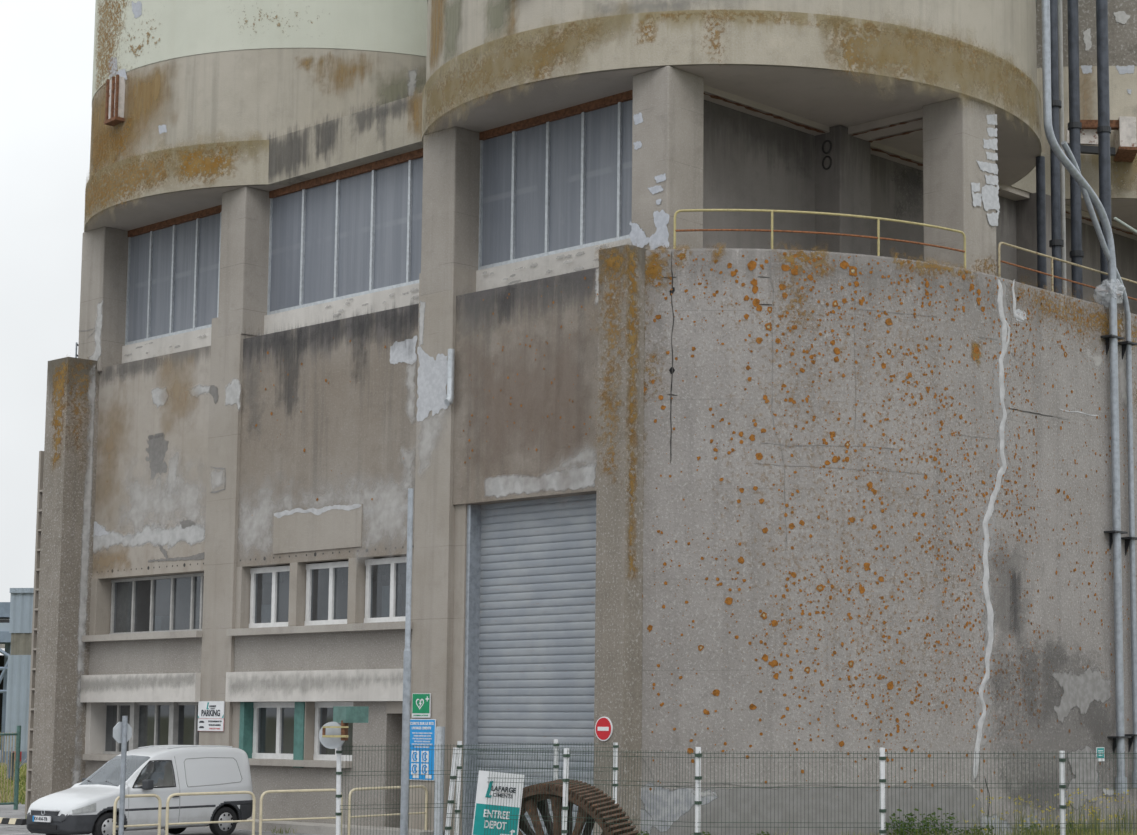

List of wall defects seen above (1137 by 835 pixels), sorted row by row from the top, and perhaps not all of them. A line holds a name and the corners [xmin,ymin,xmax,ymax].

corrosion [85,70,223,218]
peeling [93,520,205,562]
crack [642,252,1070,817]
peeling [1052,668,1111,724]
peeling [1065,745,1119,810]